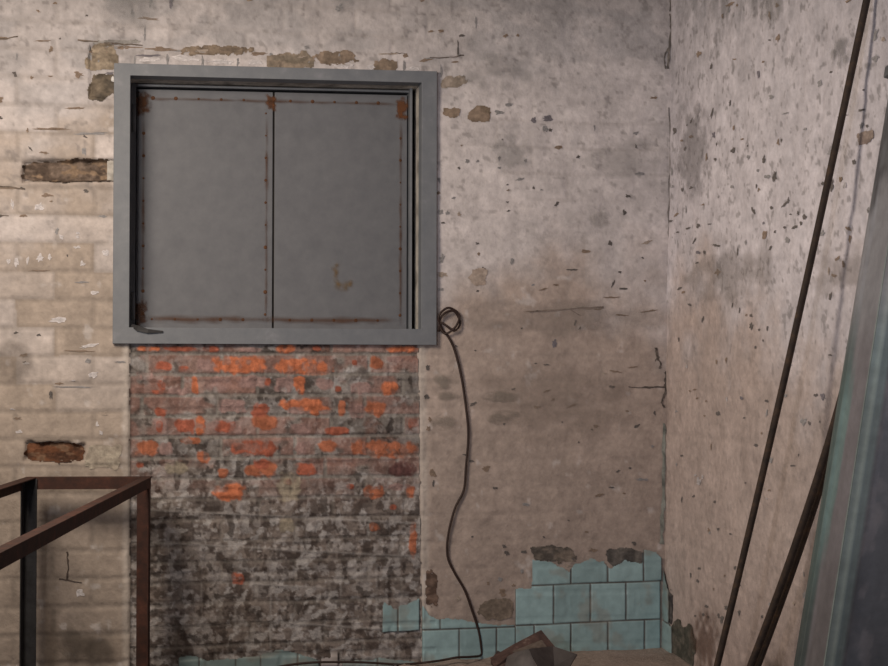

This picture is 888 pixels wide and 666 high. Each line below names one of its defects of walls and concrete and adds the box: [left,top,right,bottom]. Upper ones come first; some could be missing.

spalling [64,0,468,109]
spalling [443,103,513,122]
spalling [0,127,111,217]
spalling [24,441,85,463]
crack [628,348,667,544]
flaking render [117,344,439,666]
spalling [521,536,577,567]
spalling [589,542,643,566]
spalling [477,577,515,621]